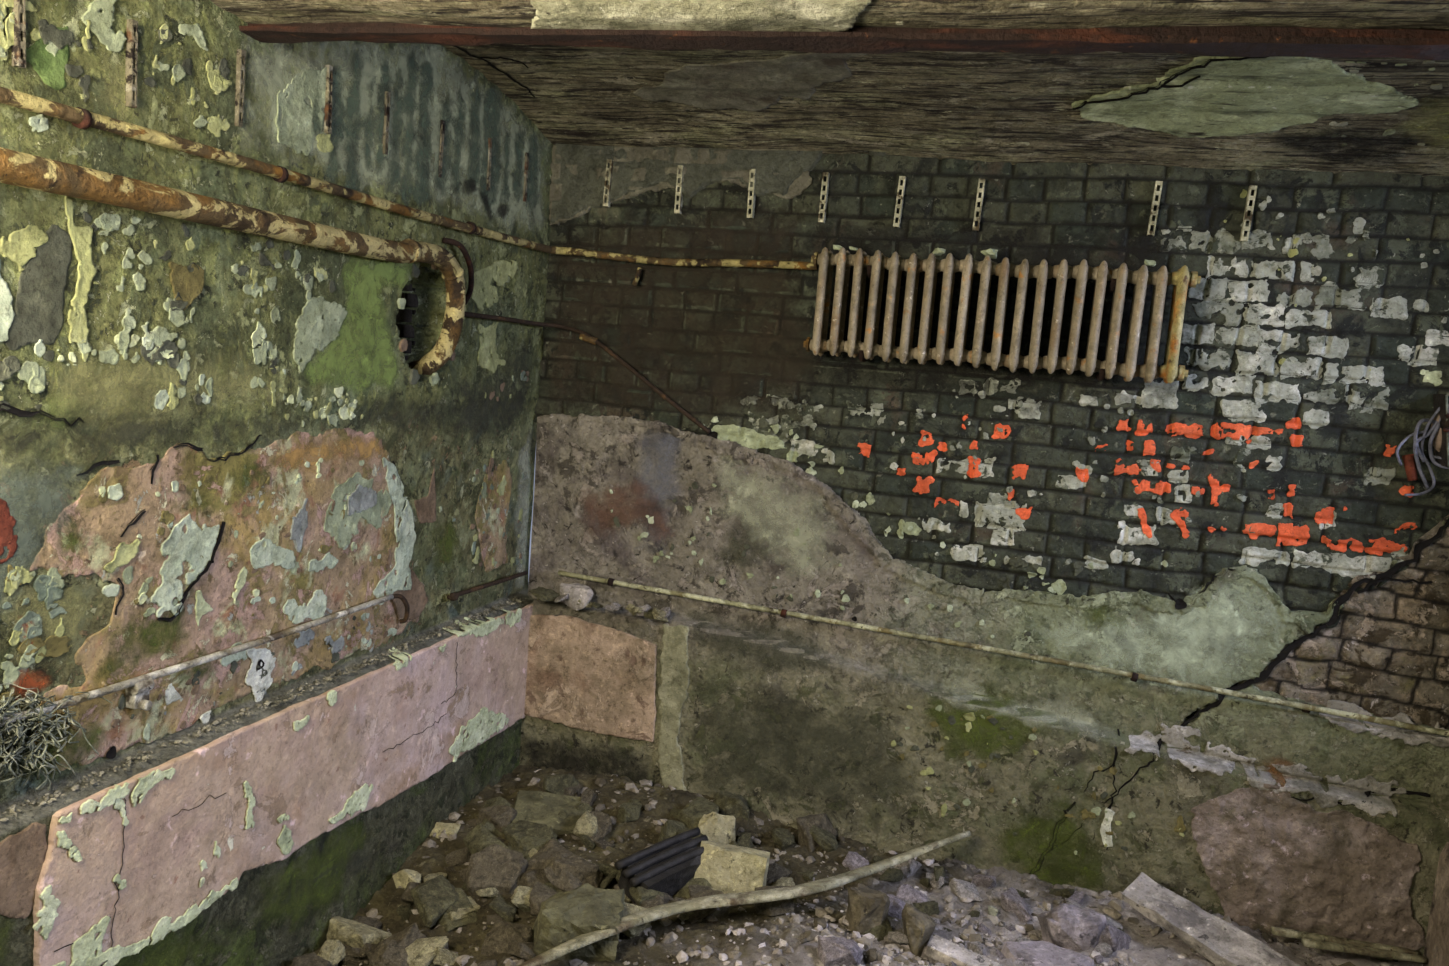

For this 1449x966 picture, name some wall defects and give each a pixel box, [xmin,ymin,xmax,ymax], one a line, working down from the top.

peeling [28,114,49,132]
peeling [143,23,232,137]
peeling [275,67,327,156]
peeling [1071,56,1443,144]
flaking render [0,196,213,411]
flaking render [471,153,1449,729]
peeling [0,238,524,771]
crack [1029,518,1449,875]
peeling [0,767,175,941]
peeling [53,841,239,966]
peeling [243,781,256,830]
peeling [328,783,373,824]